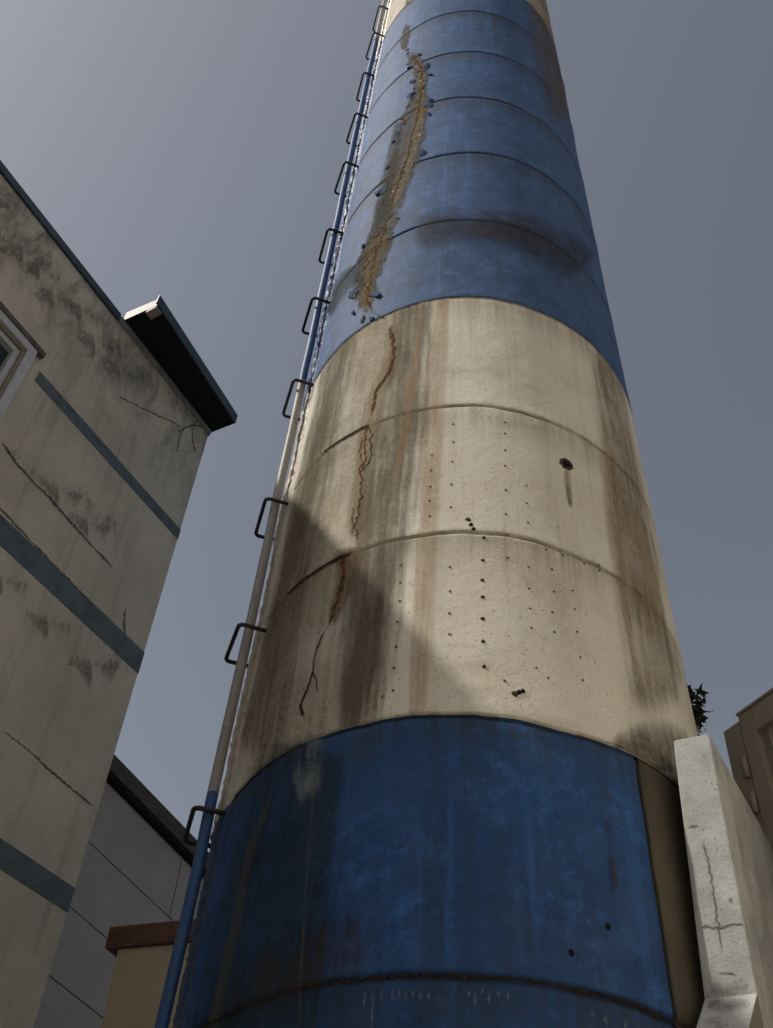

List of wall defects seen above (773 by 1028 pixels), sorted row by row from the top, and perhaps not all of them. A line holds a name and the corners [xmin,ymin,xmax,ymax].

peeling [348,25,434,324]
crack [120,397,202,452]
crack [0,508,90,602]
crack [3,444,112,567]
crack [287,328,399,716]
crack [7,733,92,805]
damp [617,730,674,771]
crack [689,825,742,943]